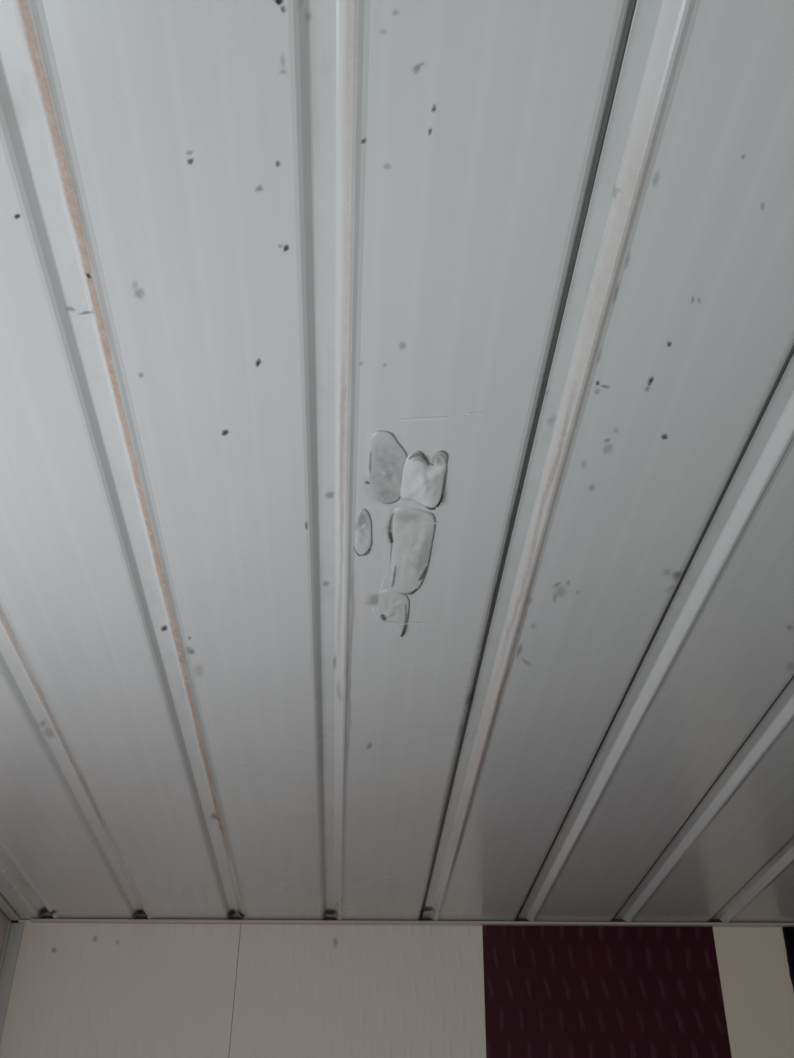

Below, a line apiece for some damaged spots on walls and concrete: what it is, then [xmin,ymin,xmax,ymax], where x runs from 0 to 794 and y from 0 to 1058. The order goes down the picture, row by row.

peeling [354,425,453,640]